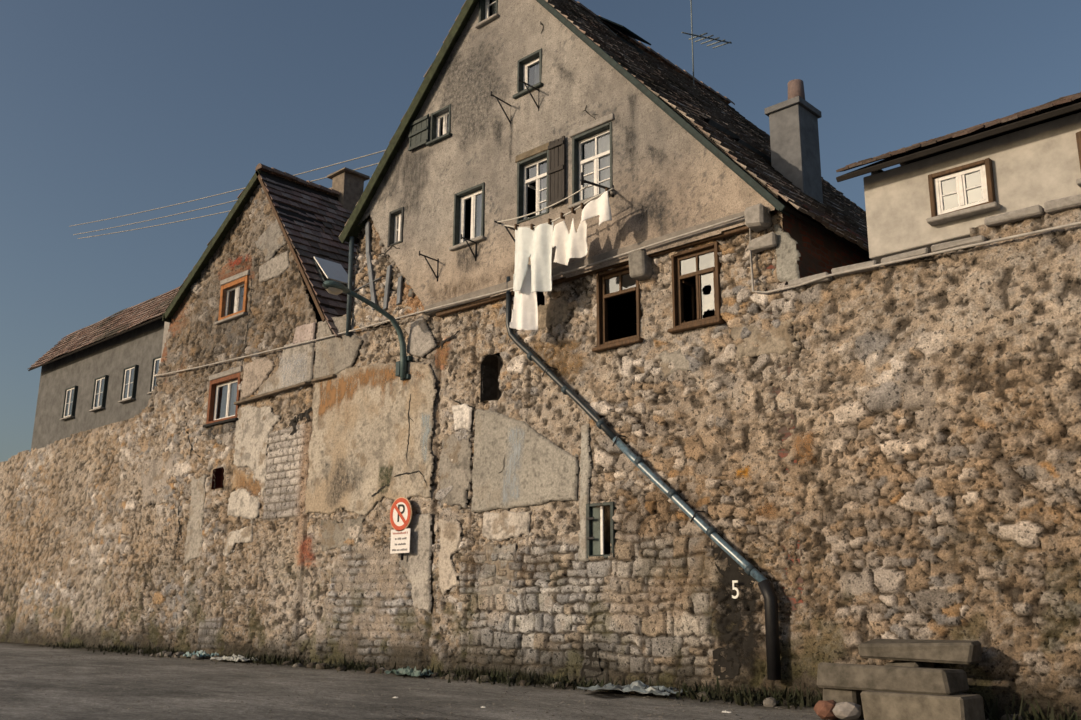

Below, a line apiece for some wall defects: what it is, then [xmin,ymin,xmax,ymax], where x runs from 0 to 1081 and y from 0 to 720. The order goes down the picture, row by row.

peeling [772,224,801,282]
peeling [223,217,592,614]
water stain [713,544,764,668]